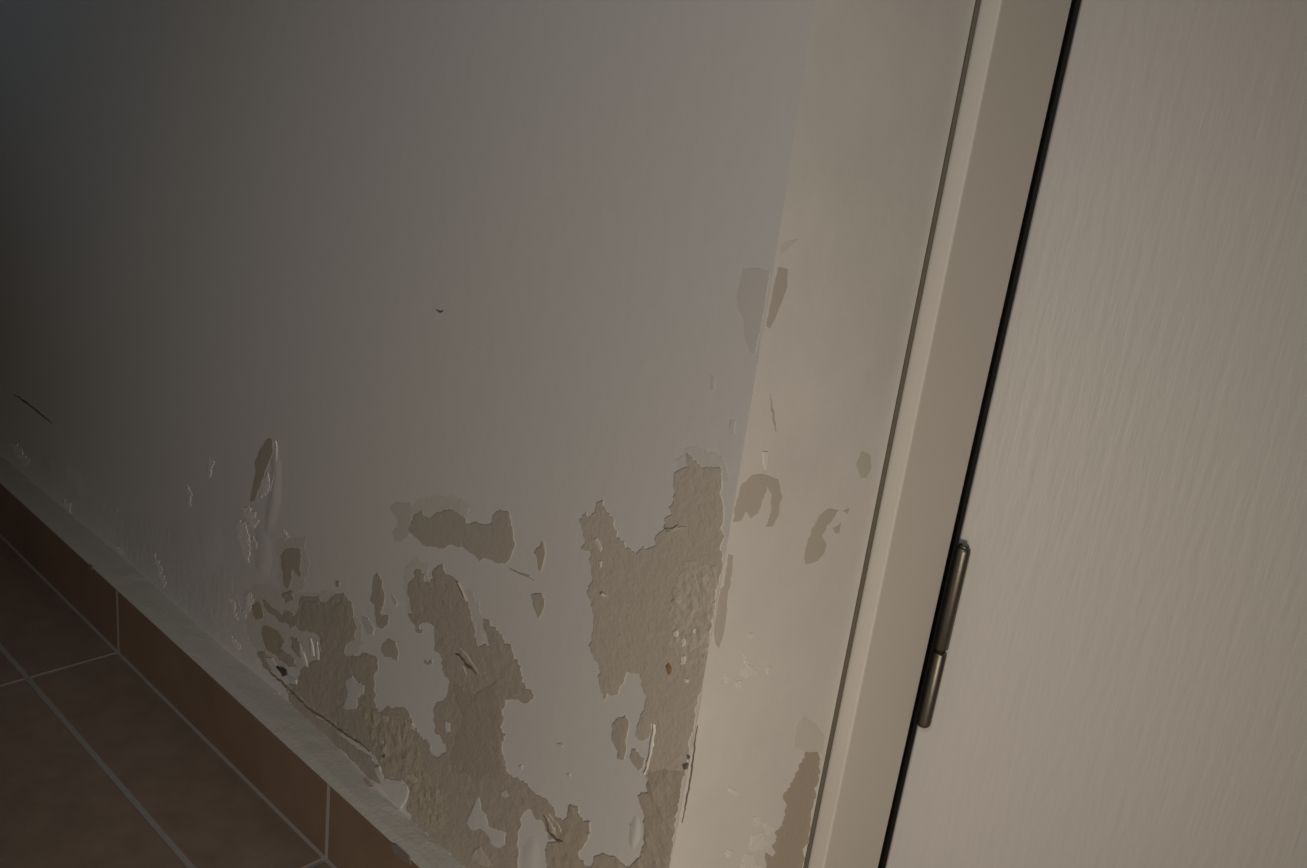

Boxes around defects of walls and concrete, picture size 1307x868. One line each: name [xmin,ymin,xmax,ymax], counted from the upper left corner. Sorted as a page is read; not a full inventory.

peeling [766,267,788,329]
spalling [250,438,277,502]
peeling [804,508,849,564]
crack [261,657,370,752]
peeling [244,453,782,868]
spalling [765,751,820,868]